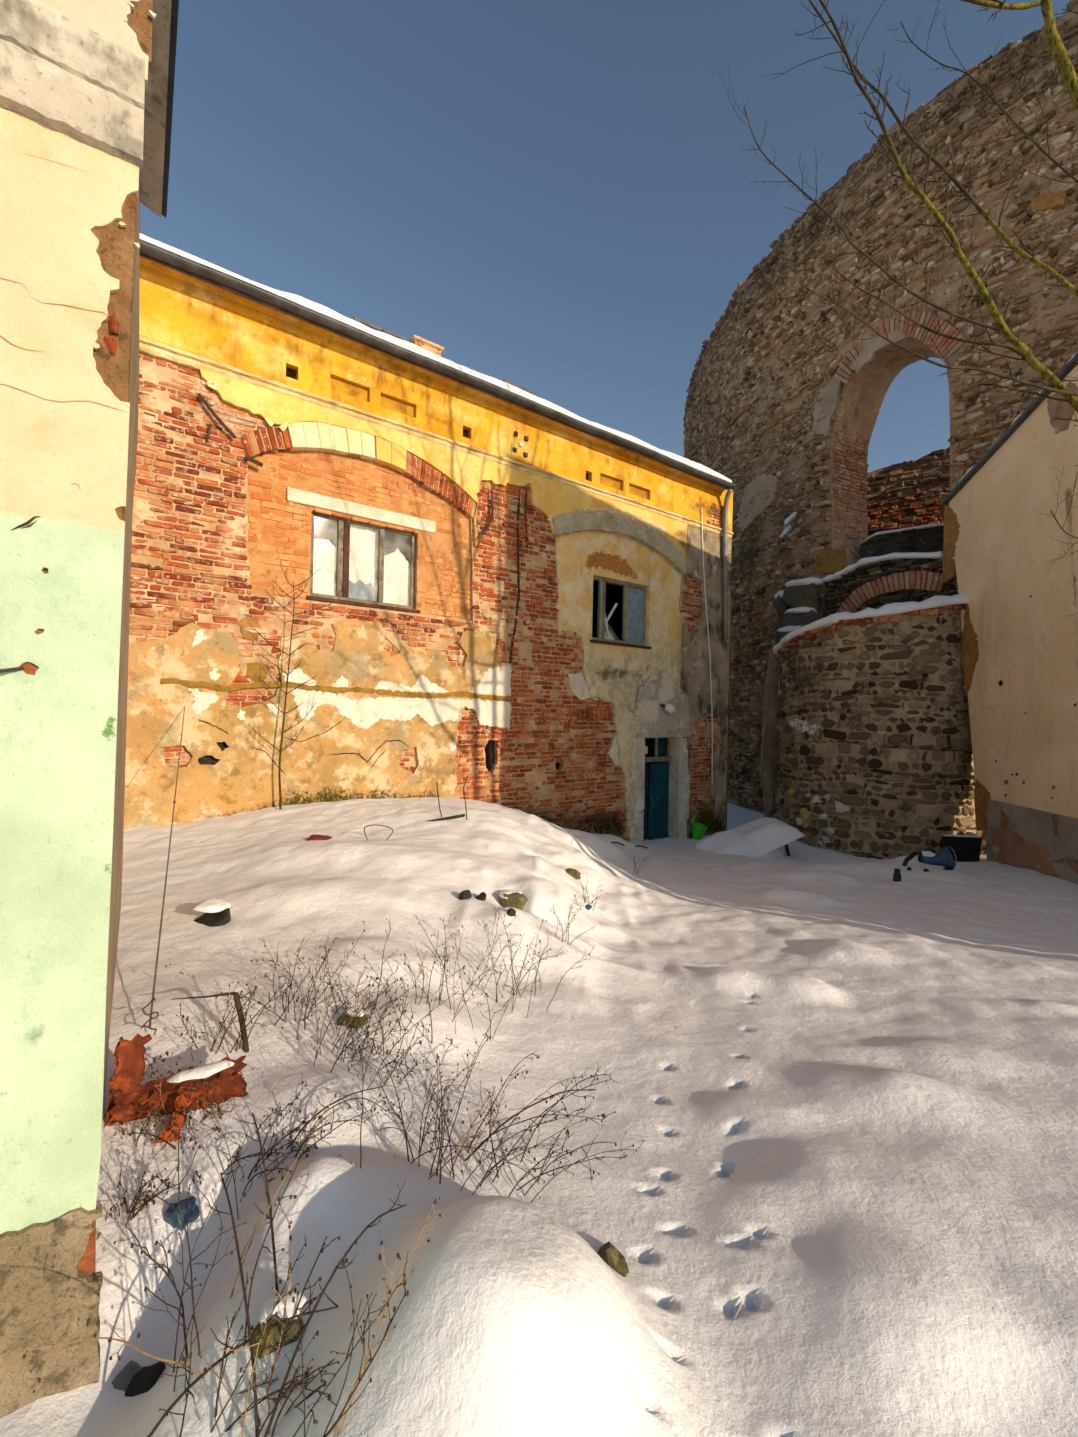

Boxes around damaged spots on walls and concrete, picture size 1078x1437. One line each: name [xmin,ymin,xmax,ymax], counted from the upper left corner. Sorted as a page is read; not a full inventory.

flaking render [124,0,157,69]
crack [0,278,106,314]
crack [0,384,125,412]
crack [12,516,40,530]
flaking render [90,193,629,842]
peeling [586,551,638,579]
flaking render [679,575,702,632]
flaking render [20,660,39,675]
flaking render [690,713,723,812]
flaking render [973,773,1078,885]